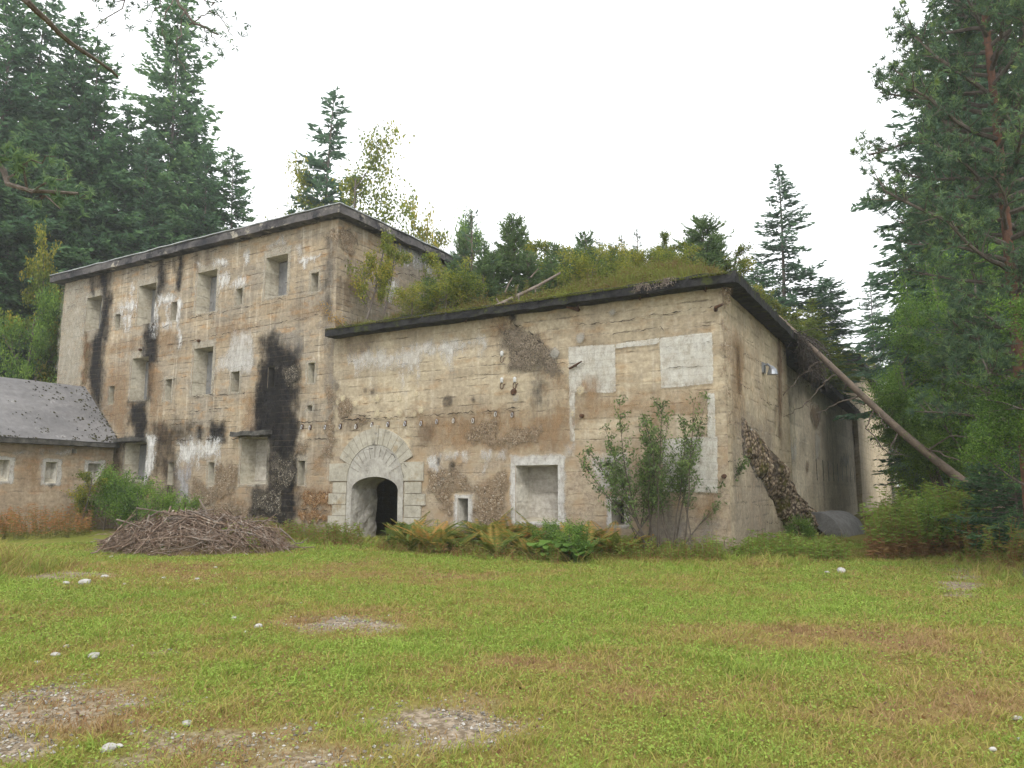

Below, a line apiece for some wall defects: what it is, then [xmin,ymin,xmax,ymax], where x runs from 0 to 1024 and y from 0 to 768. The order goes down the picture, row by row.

damp [88,273,136,408]
damp [127,254,225,505]
damp [220,330,303,528]
spalling [428,468,508,525]
spalling [501,324,563,376]